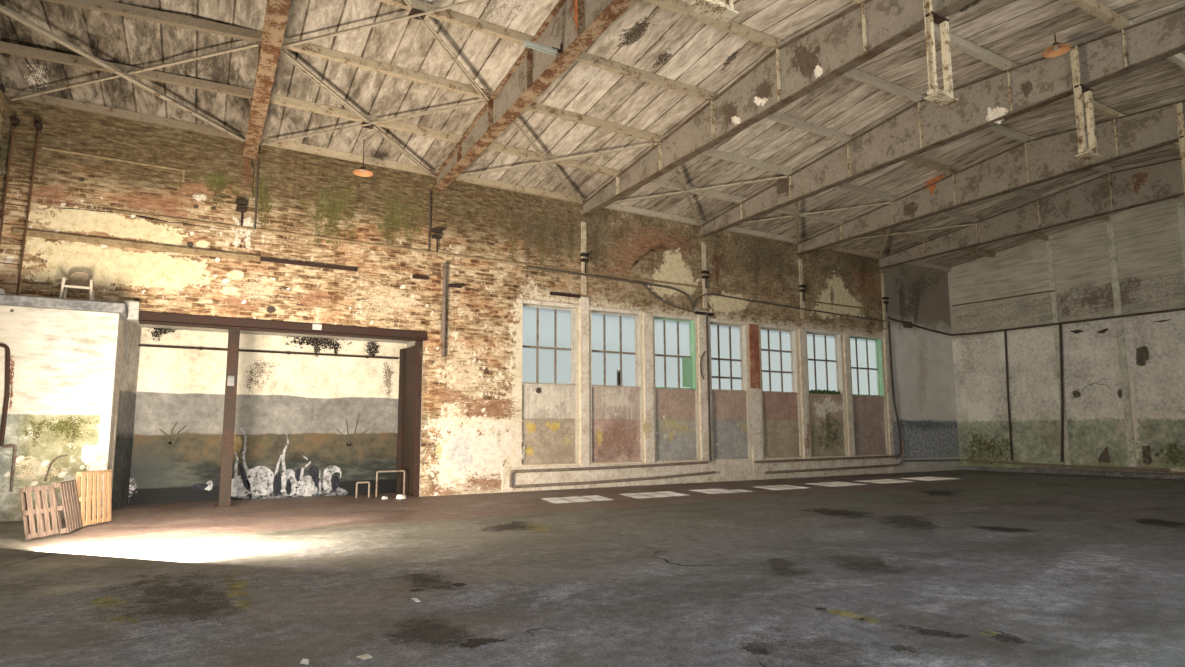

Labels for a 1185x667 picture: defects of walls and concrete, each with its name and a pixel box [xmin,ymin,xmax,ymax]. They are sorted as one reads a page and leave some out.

flaking render [5,177,331,314]
flaking render [347,285,429,325]
flaking render [648,248,752,314]
flaking render [810,270,865,320]
peeling [1117,345,1185,465]